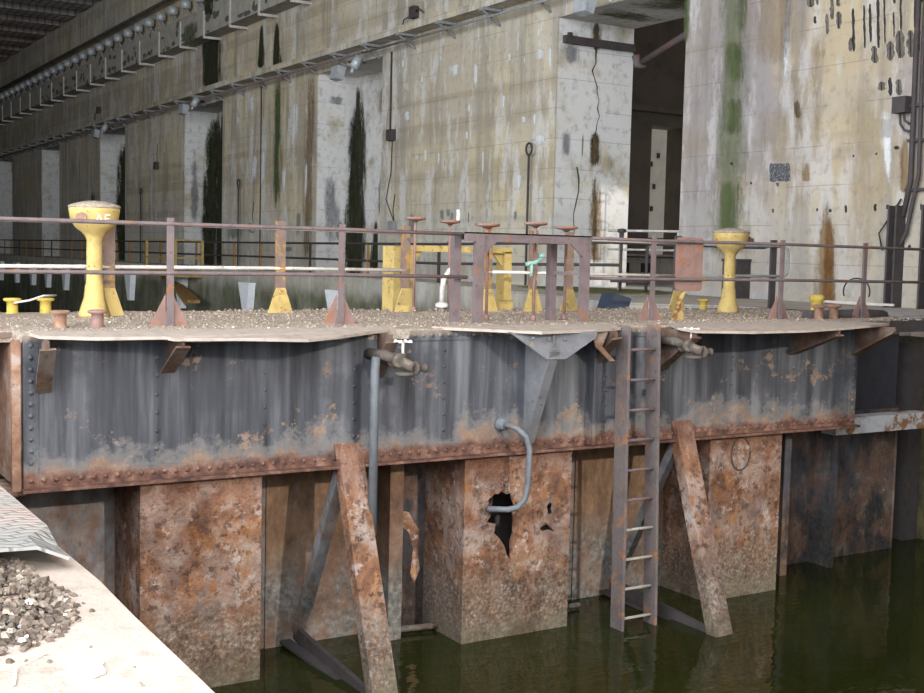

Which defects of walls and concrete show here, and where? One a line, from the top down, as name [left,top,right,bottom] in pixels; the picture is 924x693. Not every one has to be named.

leakage [728,44,743,80]
leakage [216,115,241,265]
leakage [252,88,286,199]
leakage [291,80,314,255]
leakage [325,182,341,240]
leakage [722,185,736,228]
corrosion [819,205,835,304]